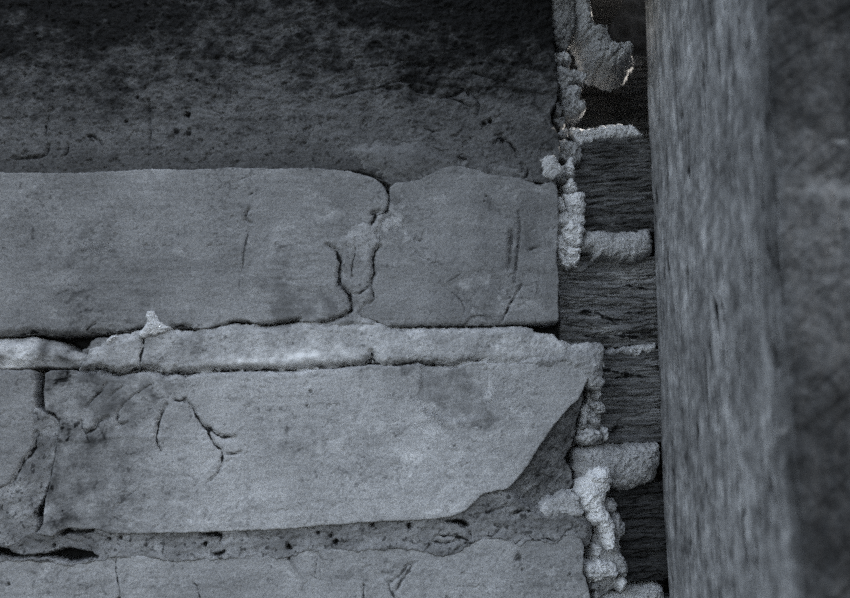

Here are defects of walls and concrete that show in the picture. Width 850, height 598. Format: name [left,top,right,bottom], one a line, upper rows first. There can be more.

crack [324,174,389,323]
crack [8,324,480,439]
crack [14,439,37,481]
crack [156,399,236,481]
spalling [506,393,583,505]